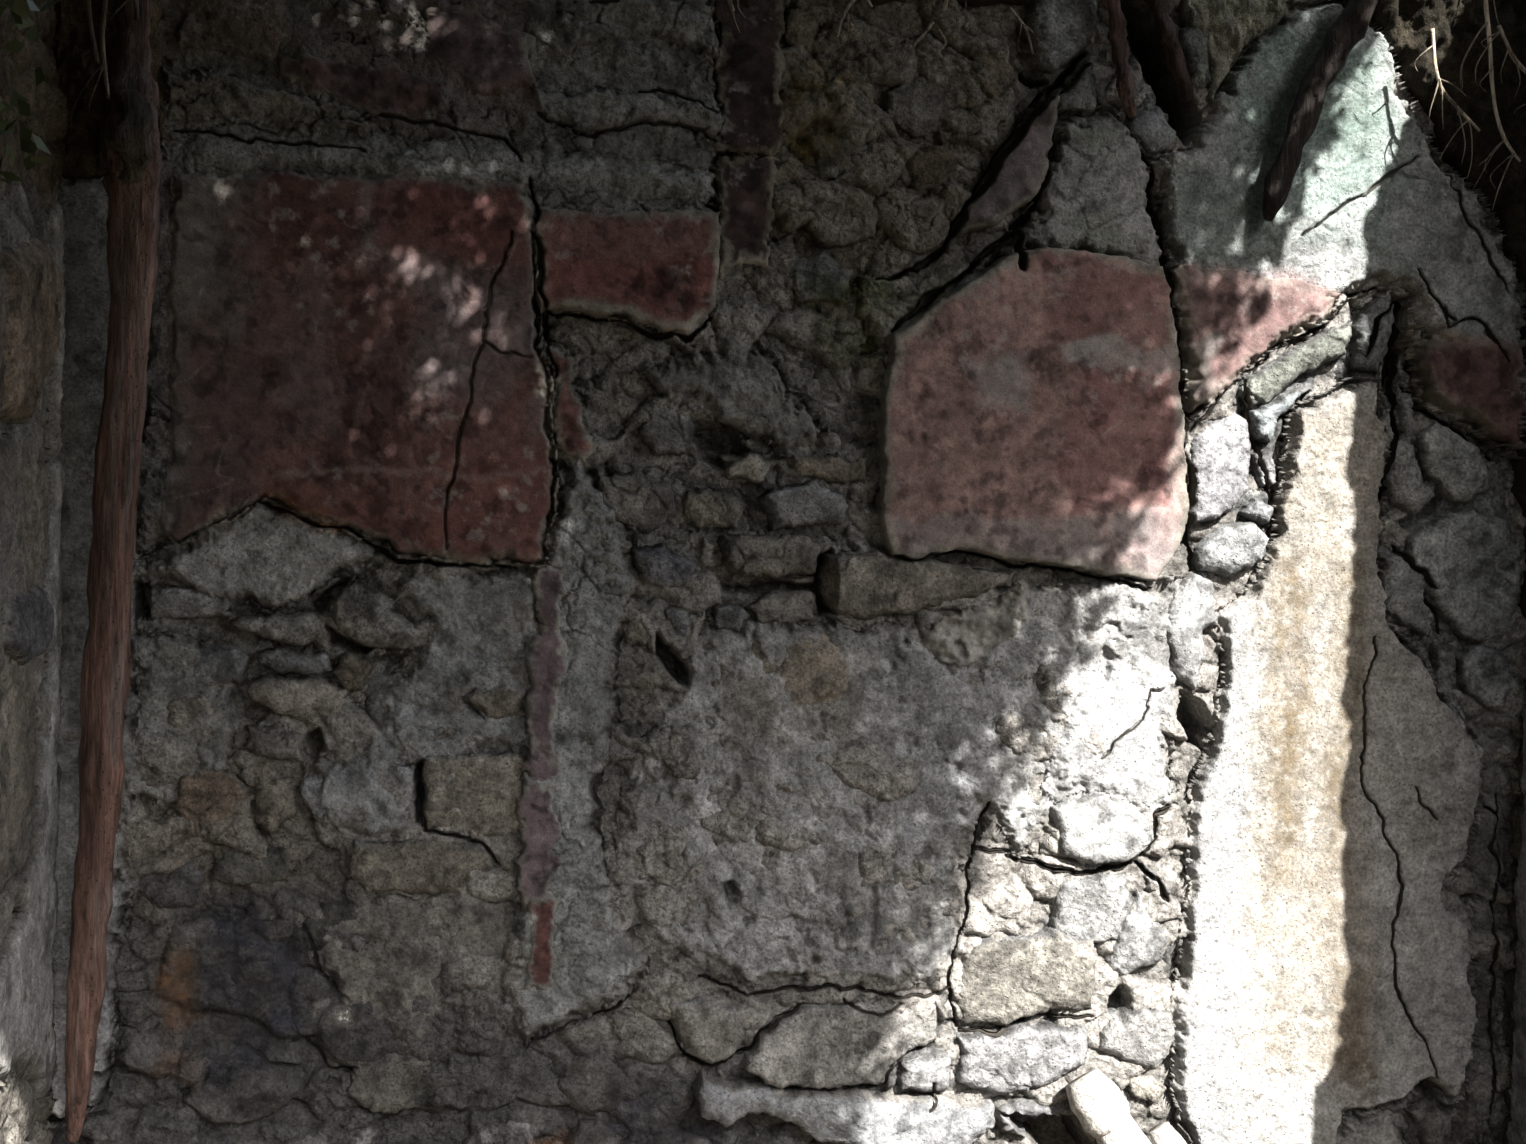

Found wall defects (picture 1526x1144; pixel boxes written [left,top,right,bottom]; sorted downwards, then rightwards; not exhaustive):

crack [174,130,365,152]
crack [265,115,711,569]
peeling [713,0,895,353]
spalling [807,71,962,191]
crack [1141,154,1510,571]
spalling [139,565,568,1018]
crack [418,761,498,864]
crack [668,801,1172,1086]
crack [930,1082,938,1112]
crack [1359,636,1439,1079]